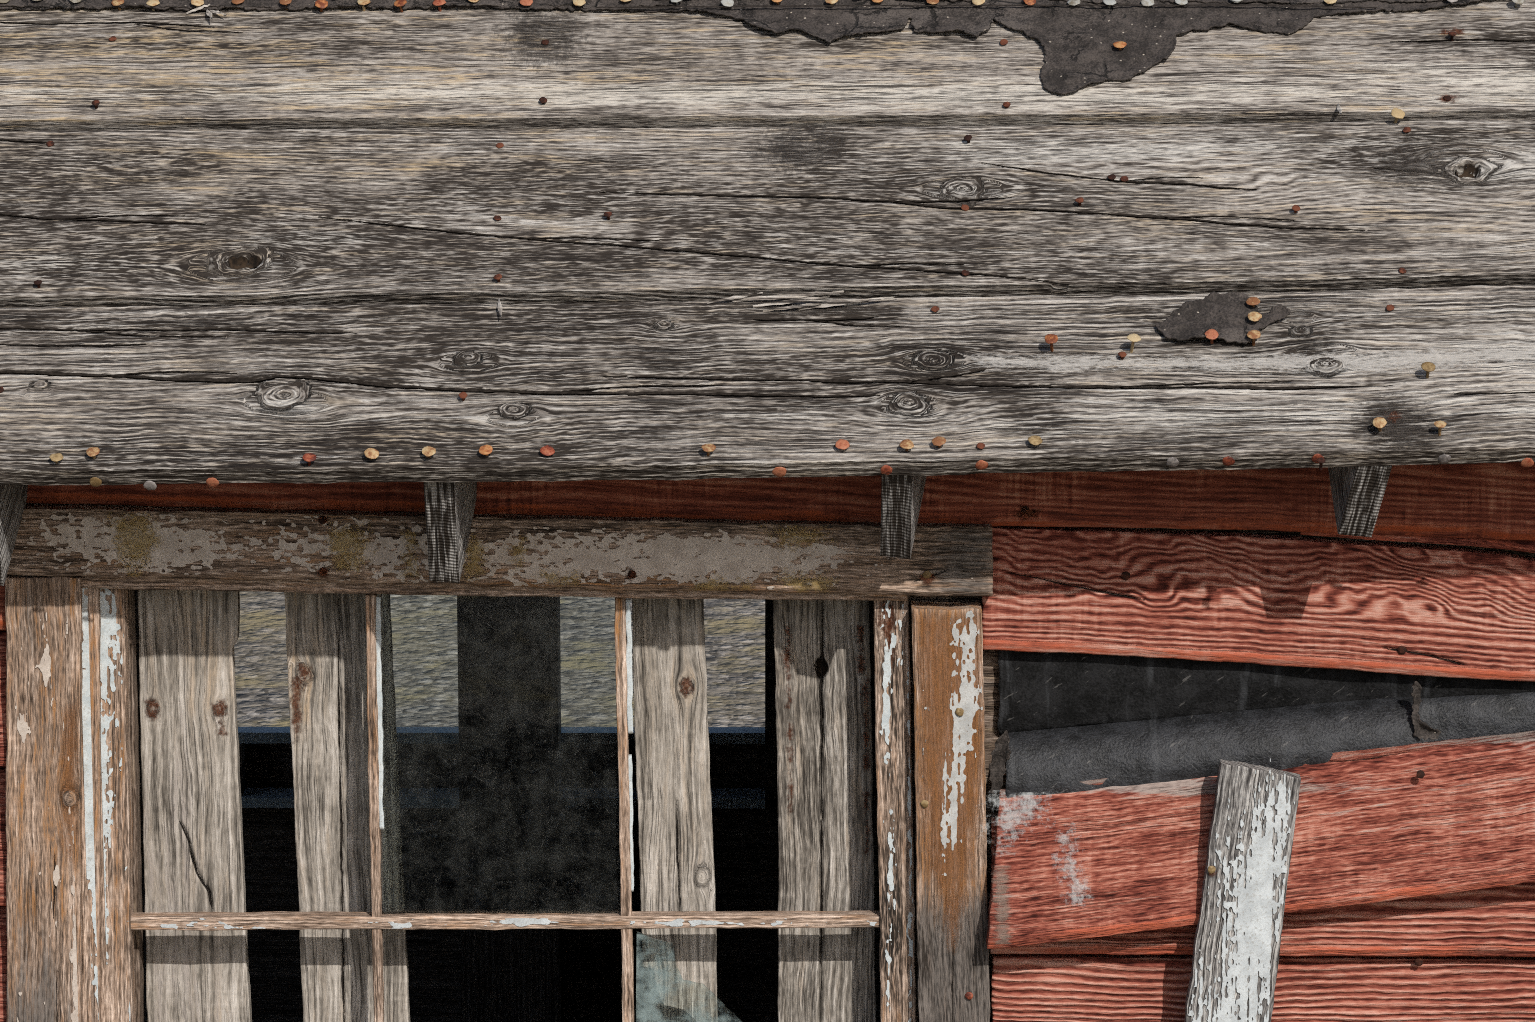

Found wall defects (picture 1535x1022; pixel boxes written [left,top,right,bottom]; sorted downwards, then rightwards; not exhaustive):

peeling [462,522,889,590]
peeling [15,706,31,743]
peeling [20,511,439,1022]
peeling [940,610,983,876]
peeling [867,600,927,1022]
crack [179,821,213,909]
peeling [485,918,558,927]
peeling [630,918,792,927]
peeling [1188,759,1295,1022]